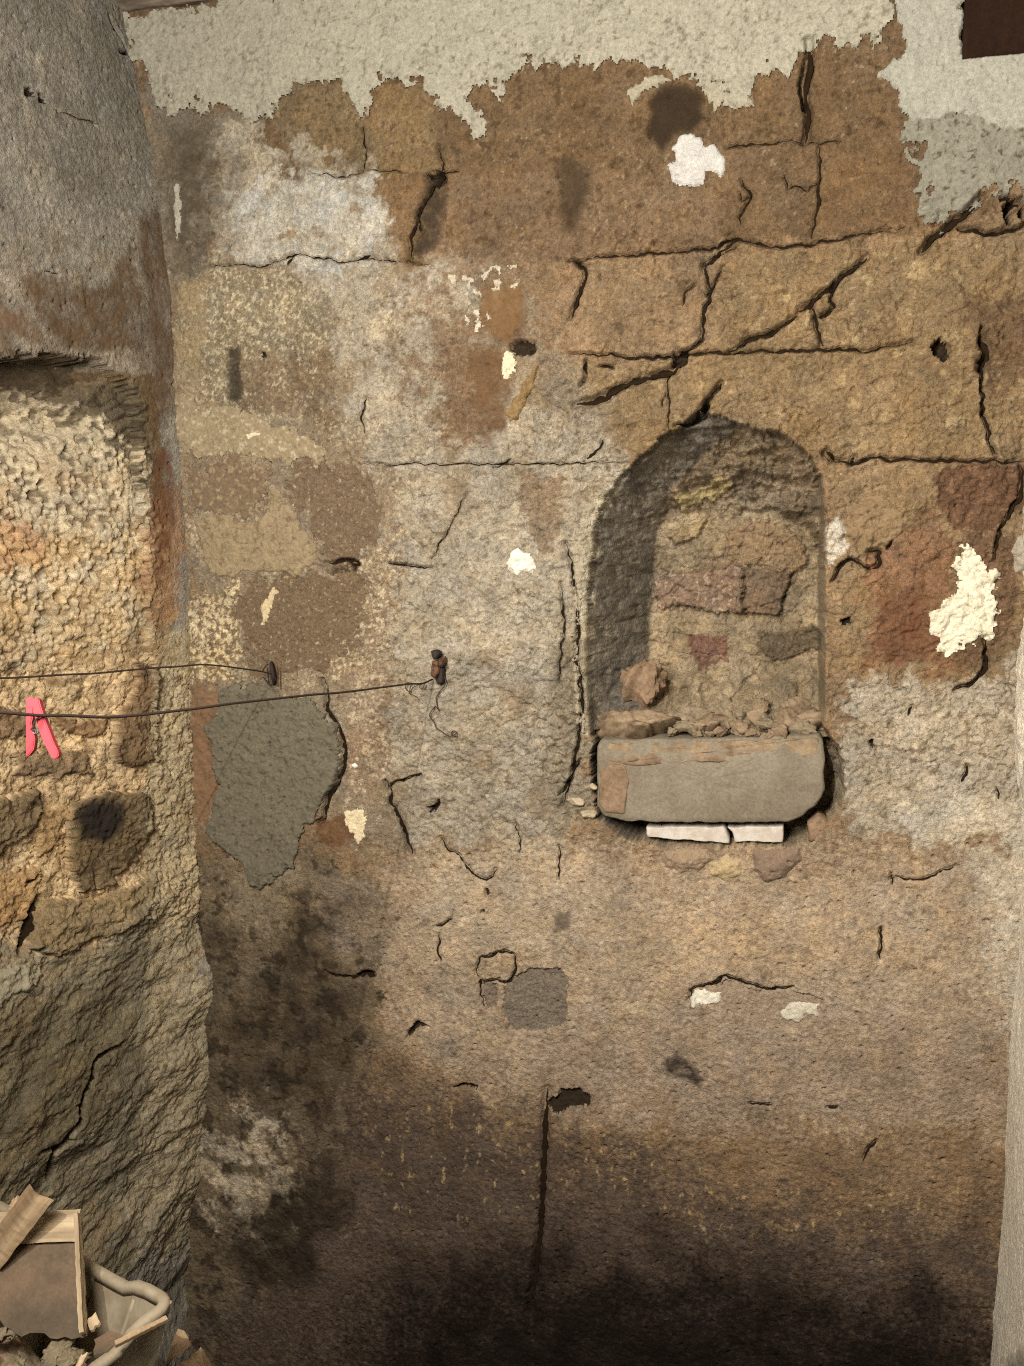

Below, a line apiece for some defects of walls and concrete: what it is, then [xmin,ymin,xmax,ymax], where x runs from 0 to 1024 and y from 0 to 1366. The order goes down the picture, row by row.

water stain [648,87,701,149]
spalling [173,183,182,241]
flaking render [448,264,520,332]
crack [570,51,1024,430]
spalling [501,351,517,379]
spalling [0,344,159,671]
crack [330,440,624,569]
crack [823,329,1024,560]
flaking render [568,492,602,733]
spalling [503,967,568,1030]
crack [689,975,789,999]
crack [530,1088,548,1309]